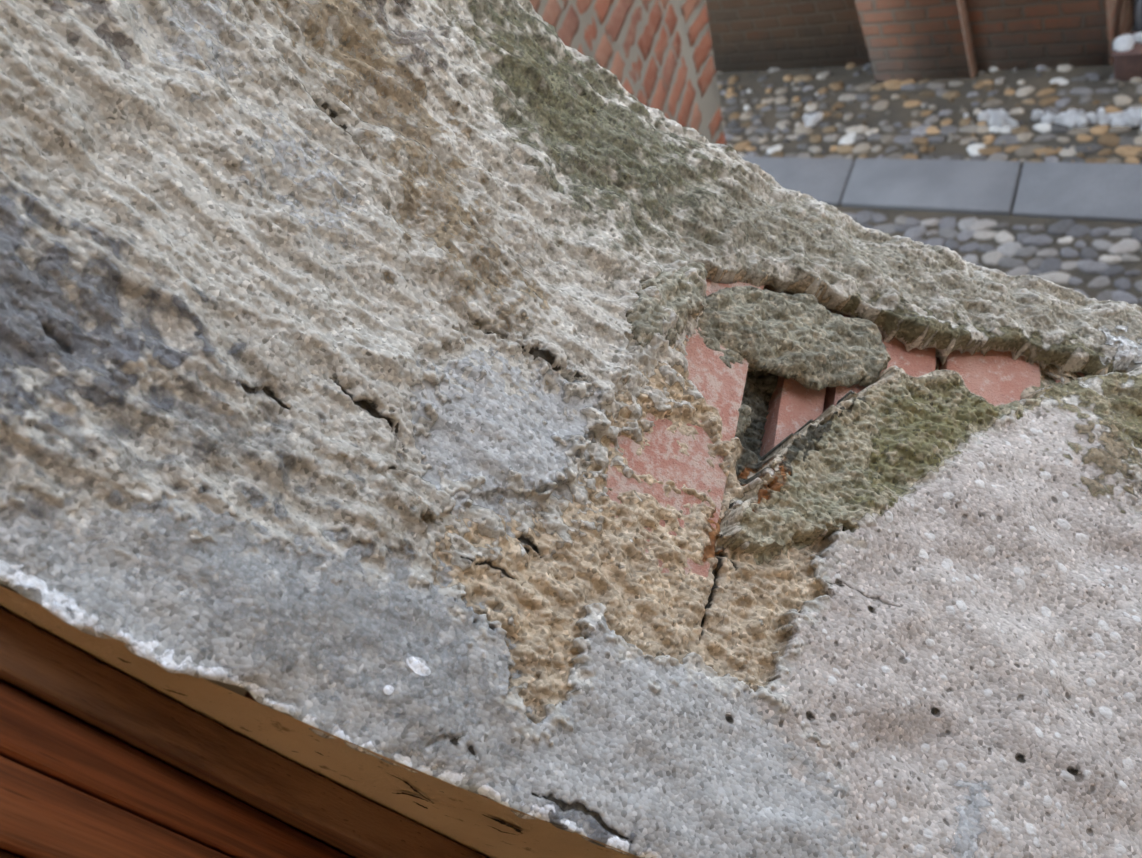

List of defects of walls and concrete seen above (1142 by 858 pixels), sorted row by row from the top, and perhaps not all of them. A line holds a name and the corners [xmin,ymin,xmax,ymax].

spalling [704,266,861,318]
crack [240,383,290,410]
crack [701,502,737,636]
spalling [403,313,1142,724]